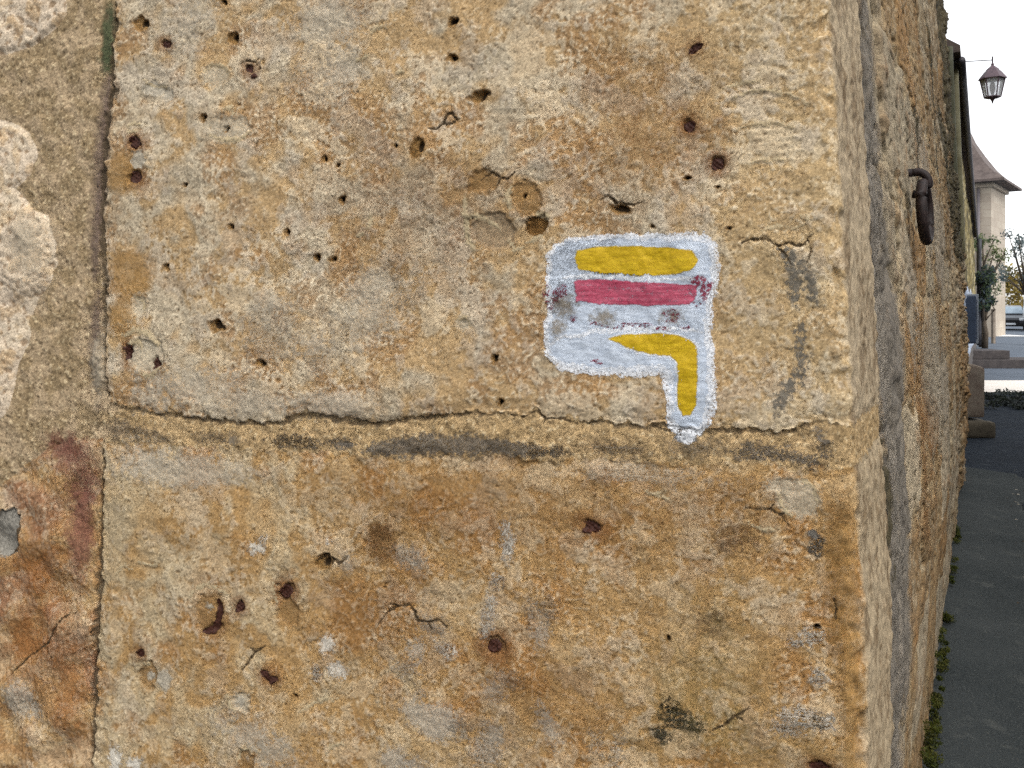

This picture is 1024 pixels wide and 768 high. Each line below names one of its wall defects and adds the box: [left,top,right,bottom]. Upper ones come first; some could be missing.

crack [99,4,814,436]
water stain [773,246,820,419]
water stain [263,431,572,460]
spalling [0,507,21,558]
rust [203,598,245,634]
crack [378,603,447,629]
rust [479,631,510,660]